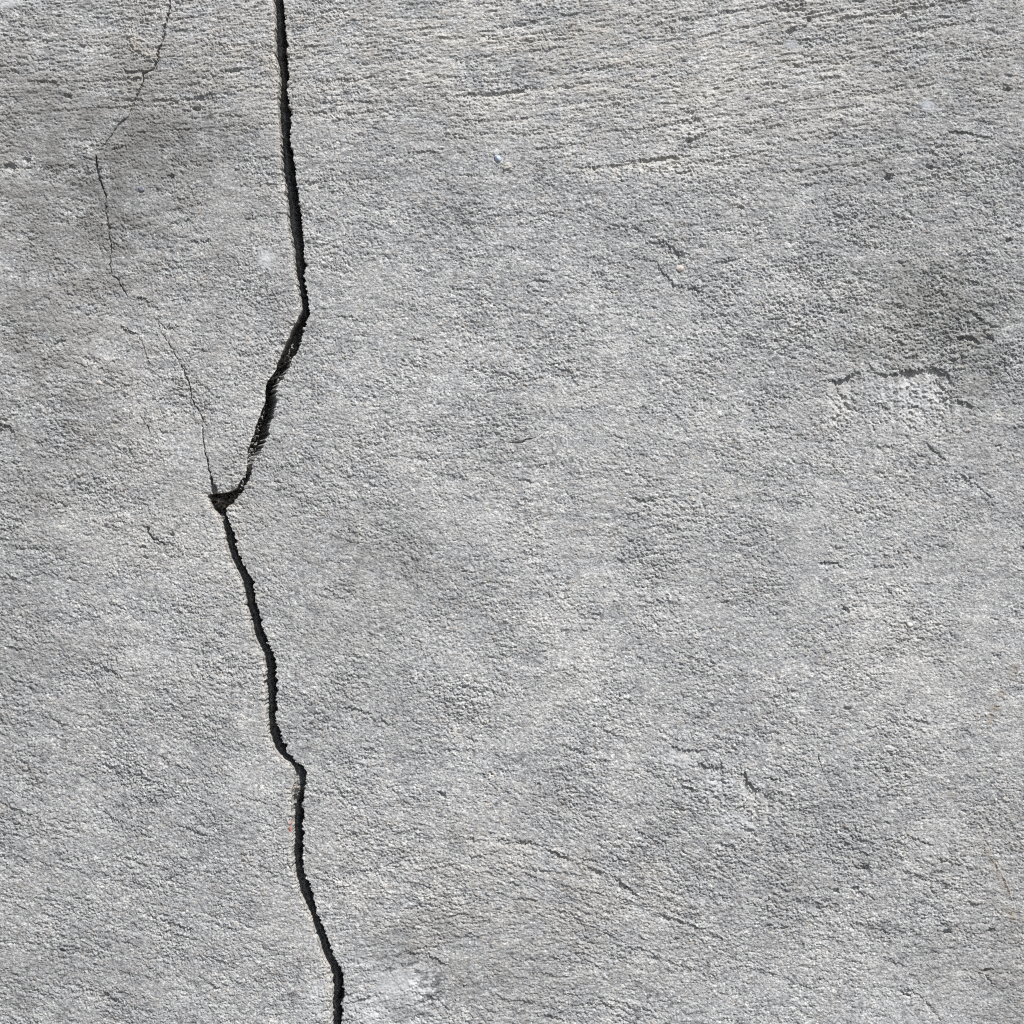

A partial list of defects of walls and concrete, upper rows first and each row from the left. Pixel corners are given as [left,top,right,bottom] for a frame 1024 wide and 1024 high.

crack [95,0,171,298]
crack [139,526,175,561]
crack [158,0,346,1024]